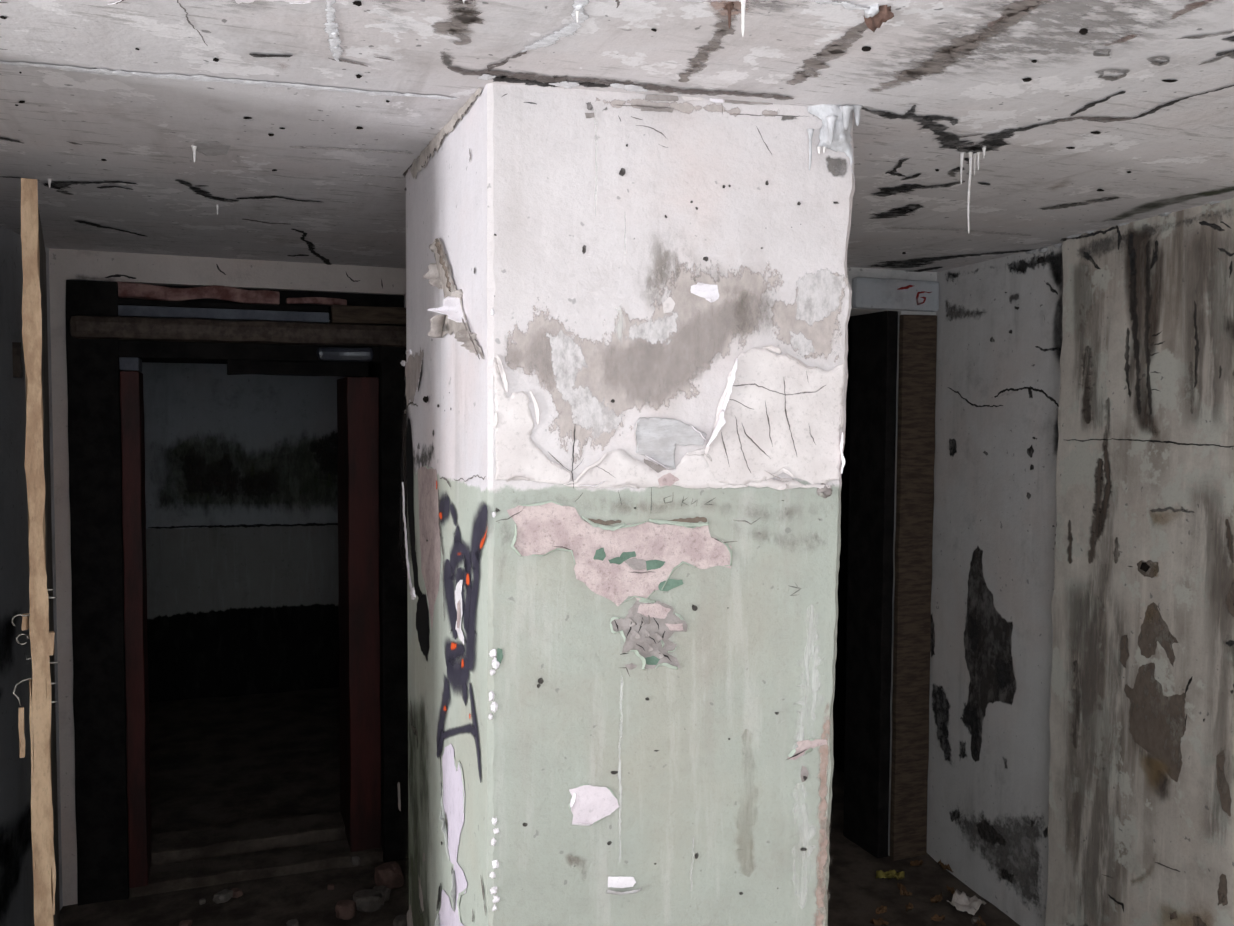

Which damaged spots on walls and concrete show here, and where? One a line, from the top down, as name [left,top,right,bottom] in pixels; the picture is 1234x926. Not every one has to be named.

flaking render [423,238,848,490]
peeling [455,580,464,645]
peeling [492,501,737,676]
peeling [488,691,498,720]
peeling [489,648,503,676]
peeling [489,817,500,911]